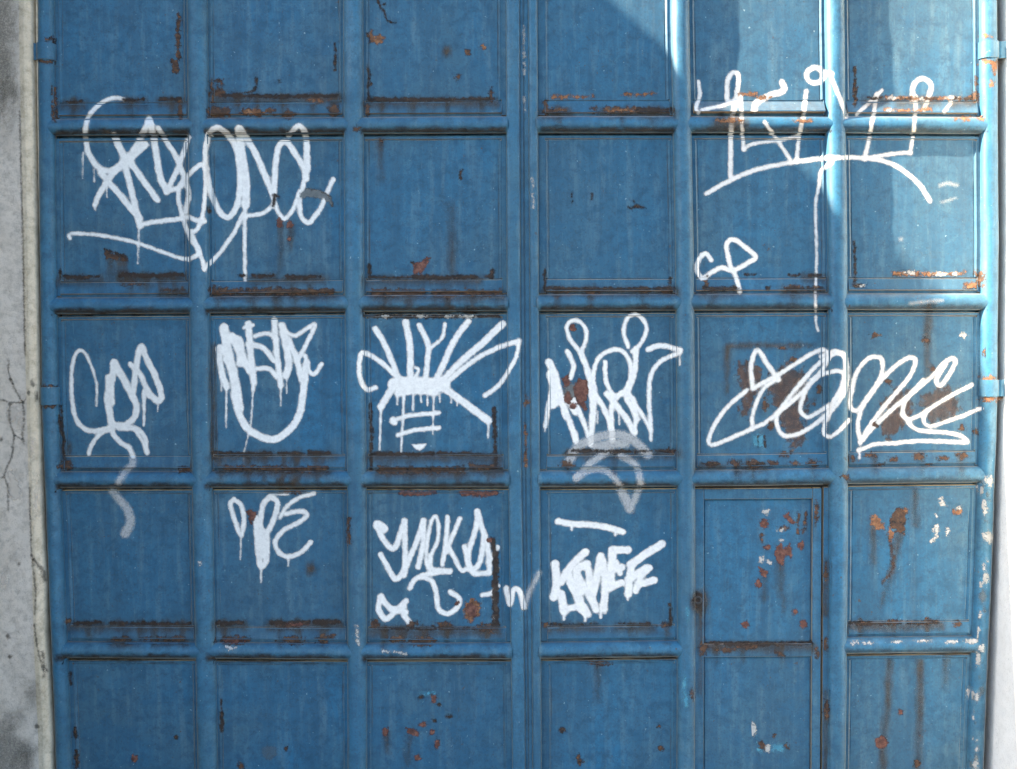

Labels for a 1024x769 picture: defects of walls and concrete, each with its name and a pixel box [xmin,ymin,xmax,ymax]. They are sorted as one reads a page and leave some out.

corrosion [206,87,340,120]
corrosion [353,86,498,132]
corrosion [542,92,675,116]
corrosion [366,263,503,300]
corrosion [892,269,986,289]
peeling [976,475,993,514]
crack [3,377,73,686]
peeling [929,497,962,543]
corrosion [370,538,500,655]
peeling [974,565,989,638]
corrosion [269,619,342,646]
crack [72,727,80,768]